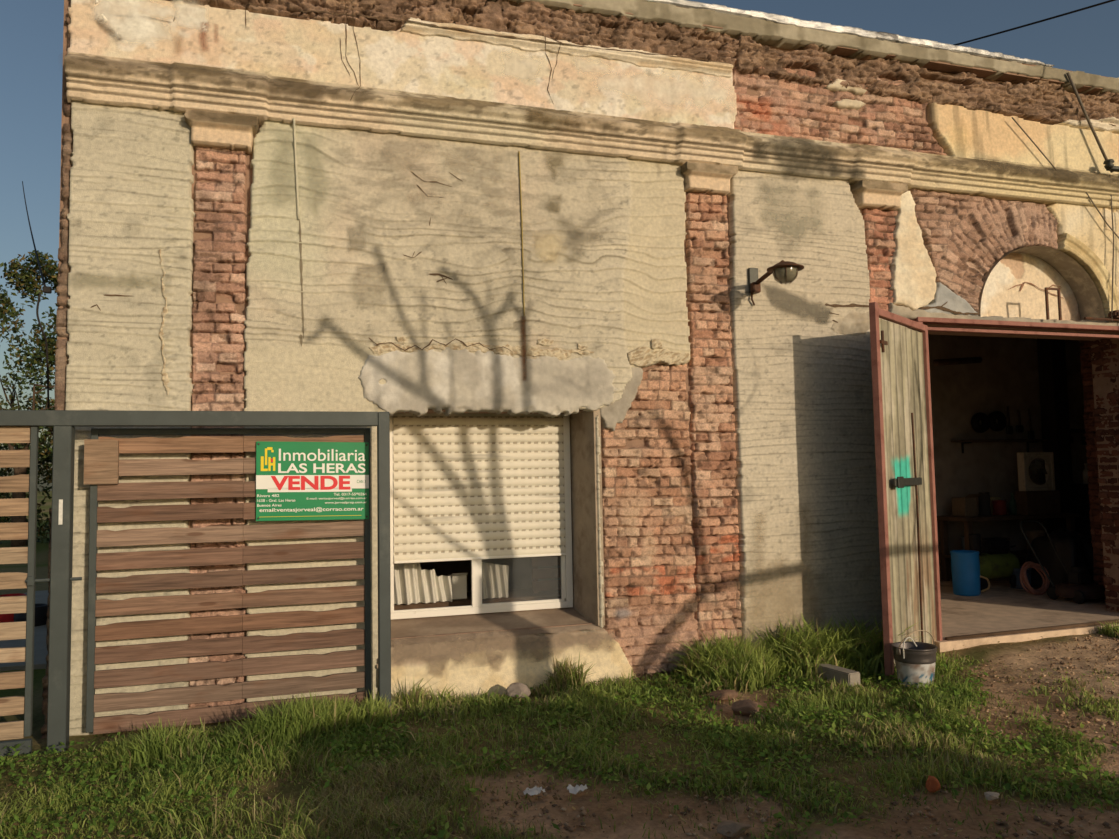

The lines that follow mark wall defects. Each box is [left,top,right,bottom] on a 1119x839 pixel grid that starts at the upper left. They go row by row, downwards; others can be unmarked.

crack [232,0,731,102]
flaking render [165,0,1119,156]
crack [410,171,462,226]
flaking render [191,146,247,411]
crack [404,252,453,283]
flaking render [862,189,1058,312]
flaking render [600,192,742,675]
flaking render [191,452,245,482]
flaking render [191,518,246,528]
flaking render [191,541,246,549]
flaking render [190,608,247,617]
flaking render [188,631,246,663]